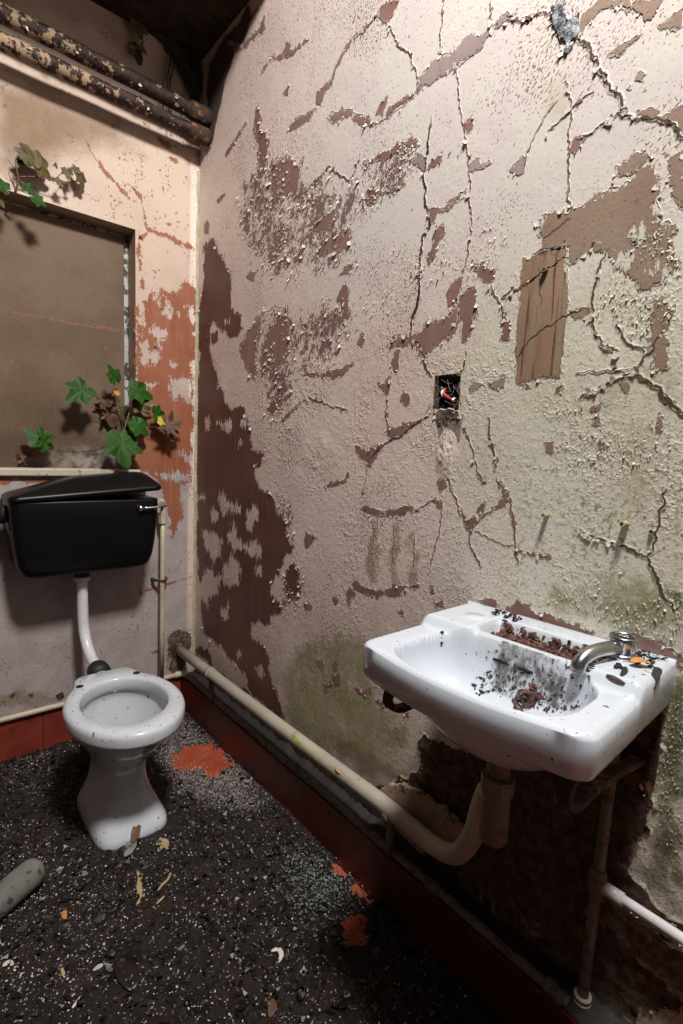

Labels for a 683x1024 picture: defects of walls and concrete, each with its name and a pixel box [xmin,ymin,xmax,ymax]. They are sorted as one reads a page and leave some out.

crack [488,0,552,27]
peeling [138,83,179,164]
crack [438,0,473,278]
crack [523,35,683,238]
peeling [98,102,511,720]
crack [409,115,468,378]
crack [372,416,551,568]
peeling [469,149,683,475]
crack [487,246,683,419]
crack [578,487,678,612]
damp [194,669,387,824]
spalling [392,696,683,1020]